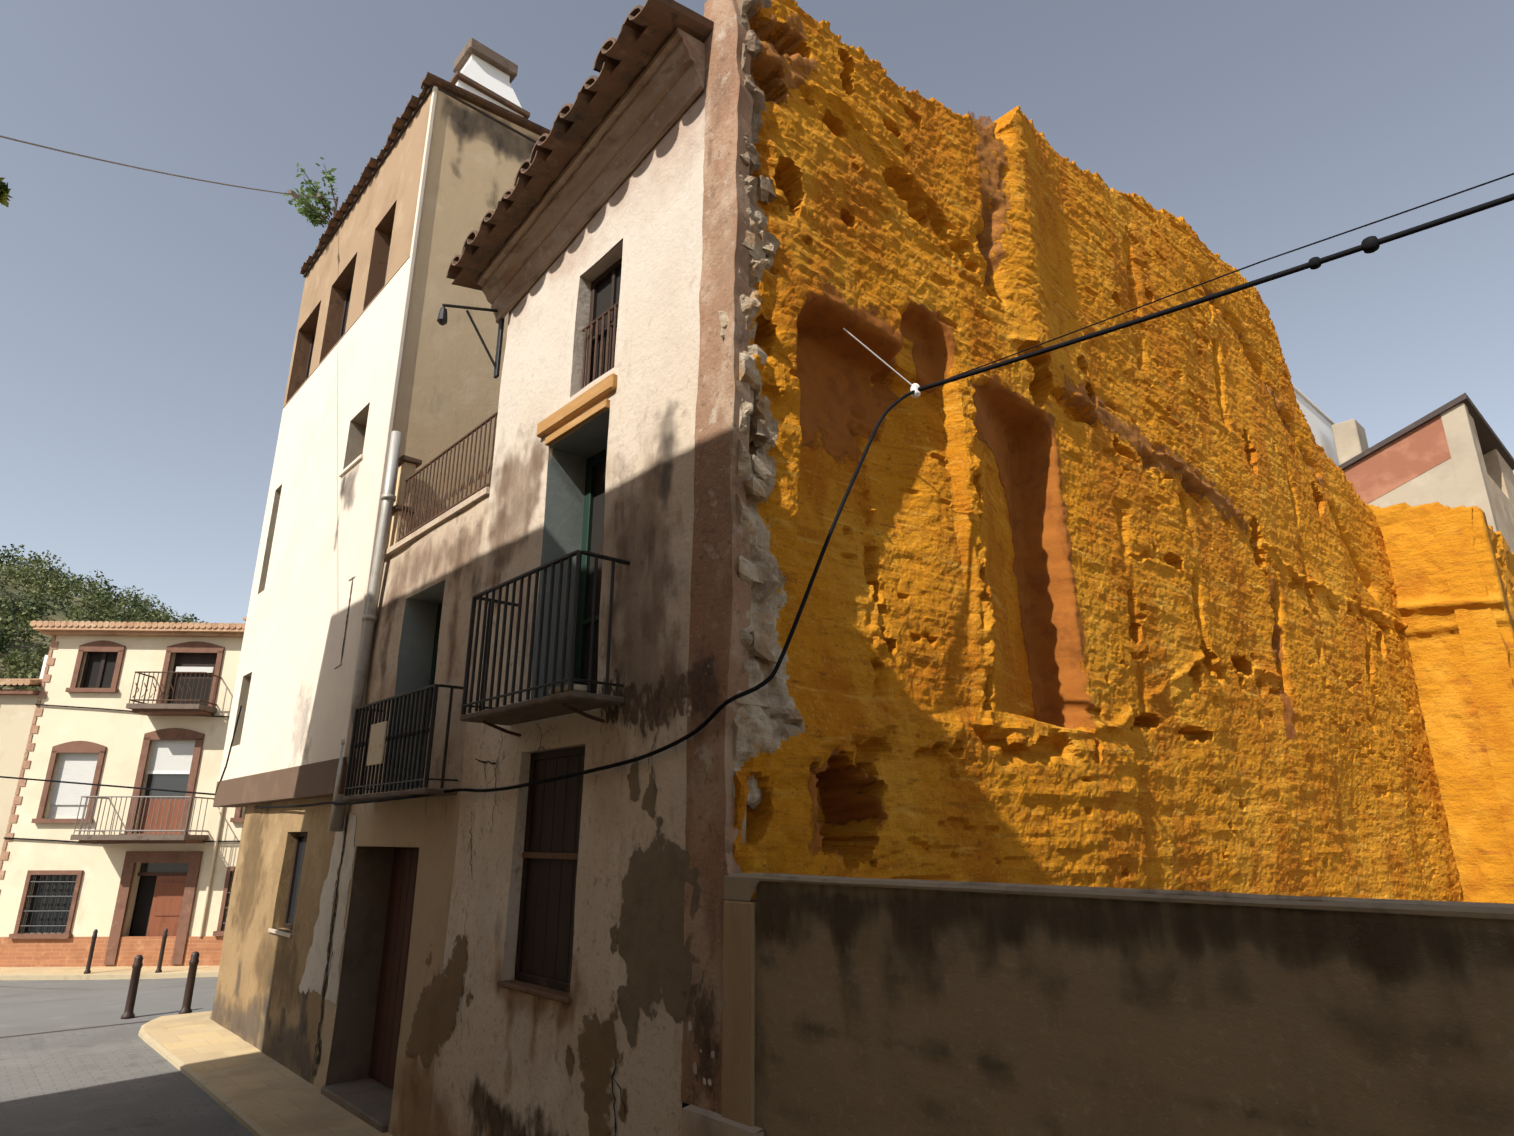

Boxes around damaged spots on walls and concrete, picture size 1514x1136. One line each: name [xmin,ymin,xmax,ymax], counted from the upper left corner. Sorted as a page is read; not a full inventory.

peeling [549,656,717,737]
peeling [565,761,722,1136]
water stain [759,882,1462,973]
water stain [214,938,309,1079]
peeling [406,935,473,1068]
water stain [463,1078,551,1136]
crack [609,1044,626,1136]